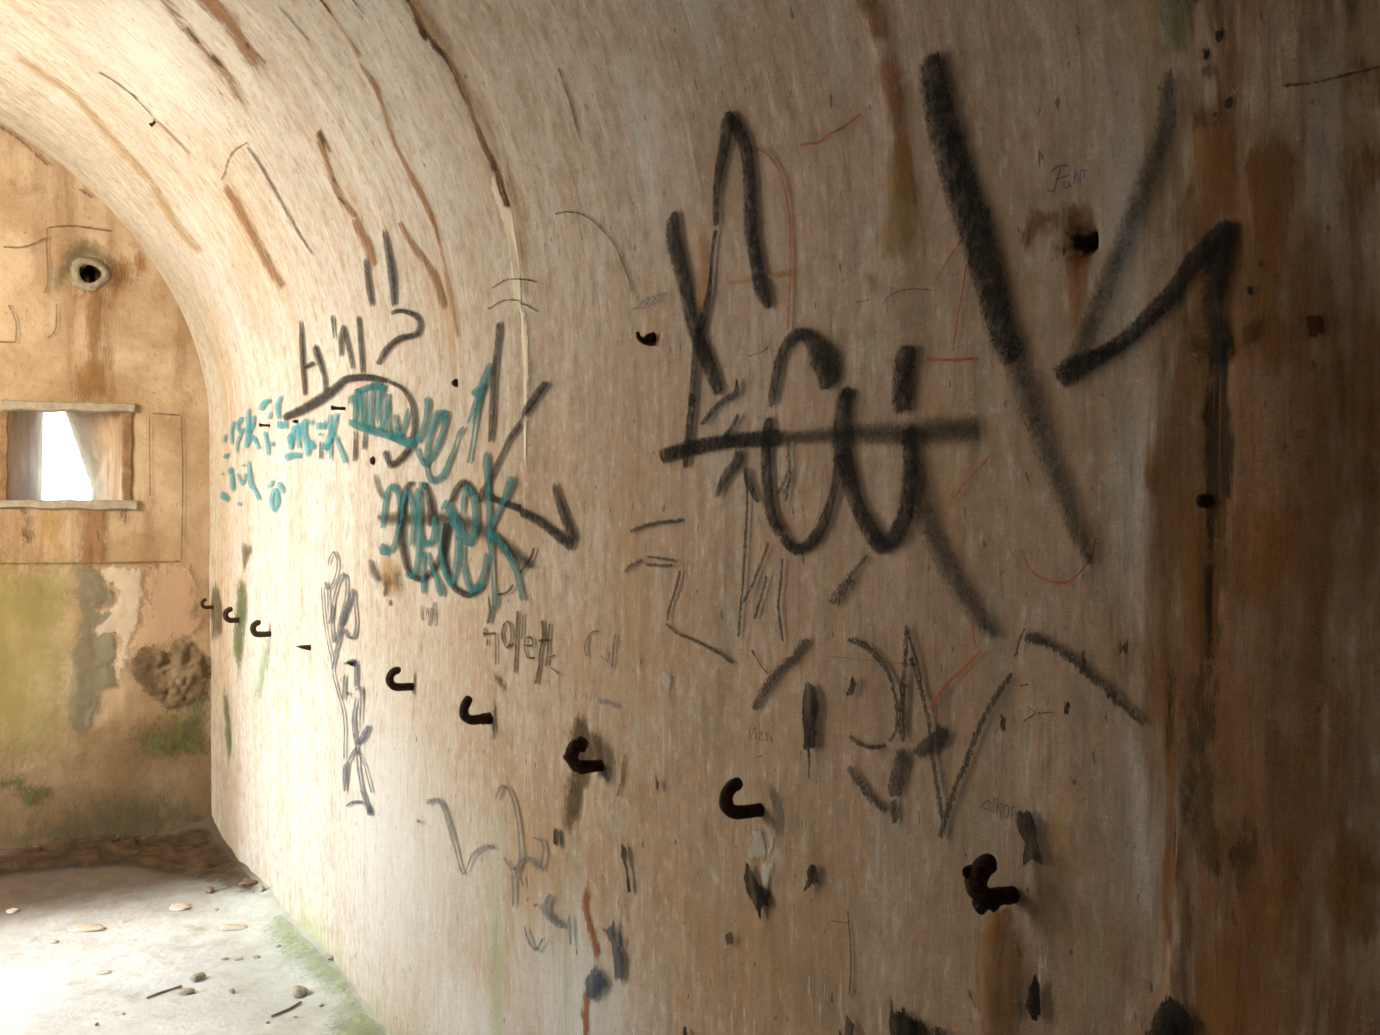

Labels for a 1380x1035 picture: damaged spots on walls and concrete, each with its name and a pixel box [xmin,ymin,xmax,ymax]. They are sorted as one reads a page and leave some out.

corrosion [857,0,887,39]
corrosion [880,58,915,251]
water stain [65,566,117,731]
peeling [91,564,211,709]
corrosion [962,865,1001,915]